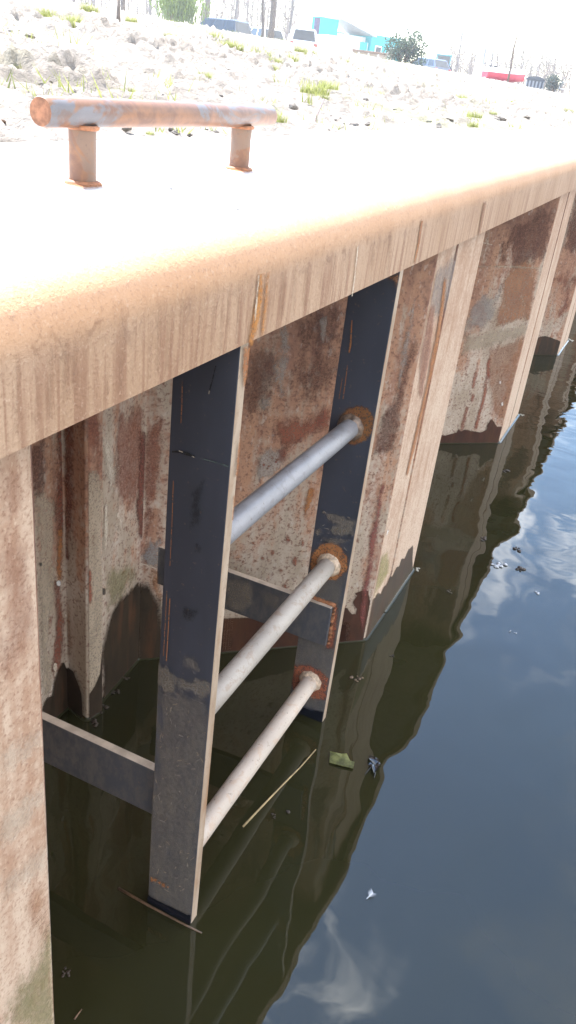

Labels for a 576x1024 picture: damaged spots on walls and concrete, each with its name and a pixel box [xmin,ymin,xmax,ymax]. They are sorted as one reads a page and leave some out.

corrosion [498,211,553,325]
corrosion [243,274,276,414]
corrosion [407,279,447,474]
corrosion [462,358,491,429]
corrosion [116,409,162,538]
corrosion [32,425,74,672]
corrosion [286,535,348,580]
corrosion [360,485,384,628]
corrosion [292,665,328,700]